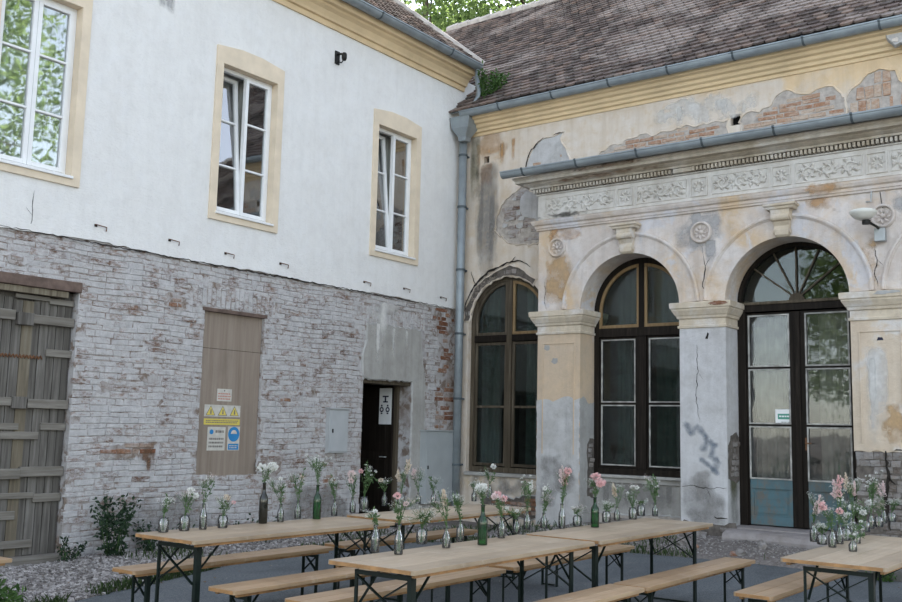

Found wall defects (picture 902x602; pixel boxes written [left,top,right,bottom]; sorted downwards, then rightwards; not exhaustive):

spalling [598,68,902,155]
flaking render [526,132,572,167]
spalling [494,187,539,247]